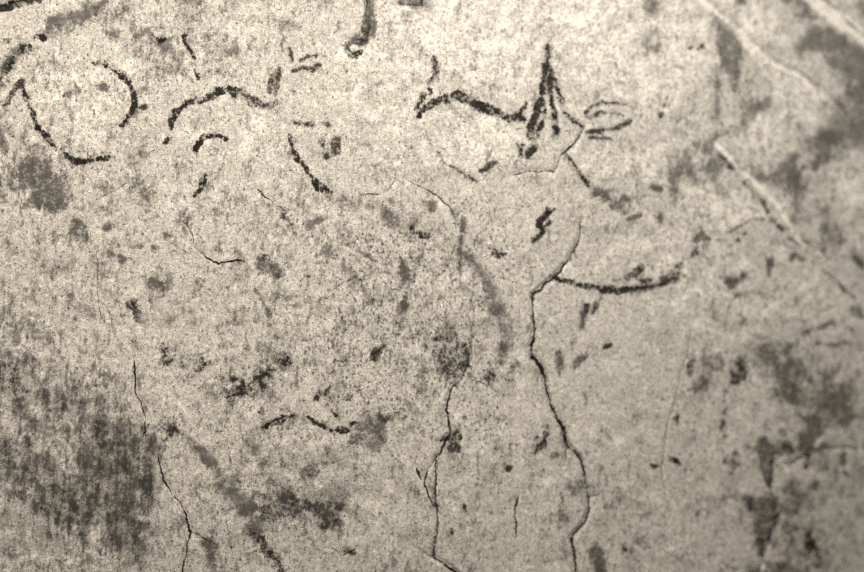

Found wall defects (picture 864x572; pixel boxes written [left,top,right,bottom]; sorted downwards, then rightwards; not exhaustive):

crack [412,314,501,572]
crack [512,495,520,534]
crack [529,221,602,572]